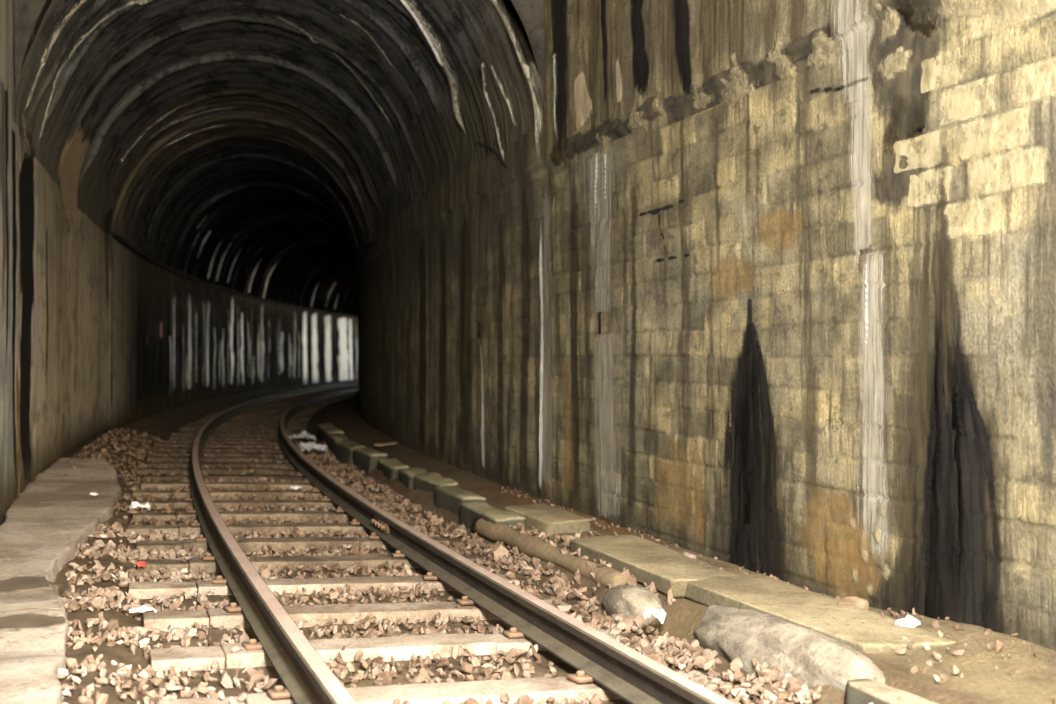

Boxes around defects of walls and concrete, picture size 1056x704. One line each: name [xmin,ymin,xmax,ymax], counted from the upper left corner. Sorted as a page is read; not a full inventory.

water stain [400,0,466,134]
water stain [481,63,515,160]
water stain [491,0,567,163]
water stain [631,0,649,95]
water stain [831,0,1006,633]
water stain [720,299,789,581]